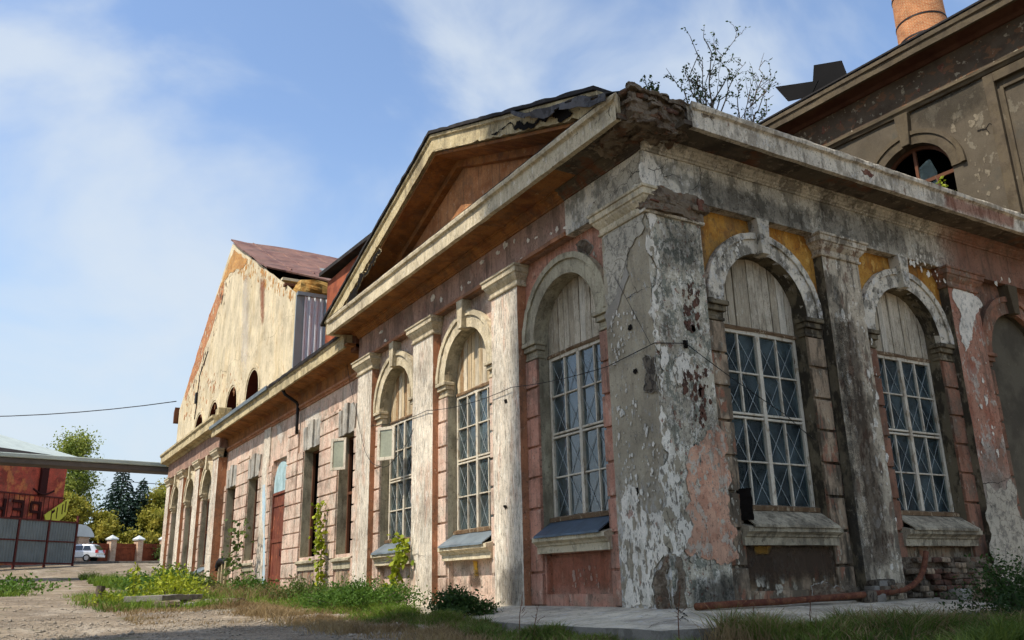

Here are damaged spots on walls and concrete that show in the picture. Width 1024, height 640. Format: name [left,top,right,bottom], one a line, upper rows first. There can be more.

flaking render [491,108,572,135]
spalling [584,81,688,219]
crack [614,159,702,193]
flaking render [572,212,745,609]
water stain [743,323,888,582]
flaking render [755,575,785,596]